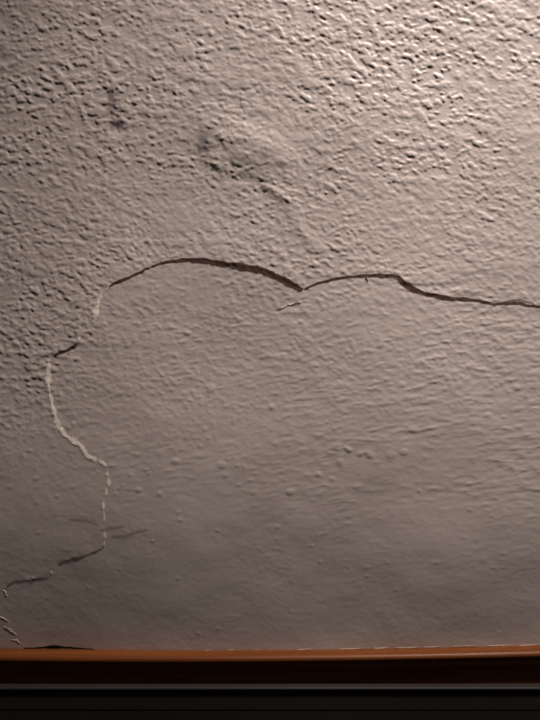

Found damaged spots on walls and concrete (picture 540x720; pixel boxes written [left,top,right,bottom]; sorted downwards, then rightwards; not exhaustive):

crack [92,258,540,323]
crack [7,337,115,587]